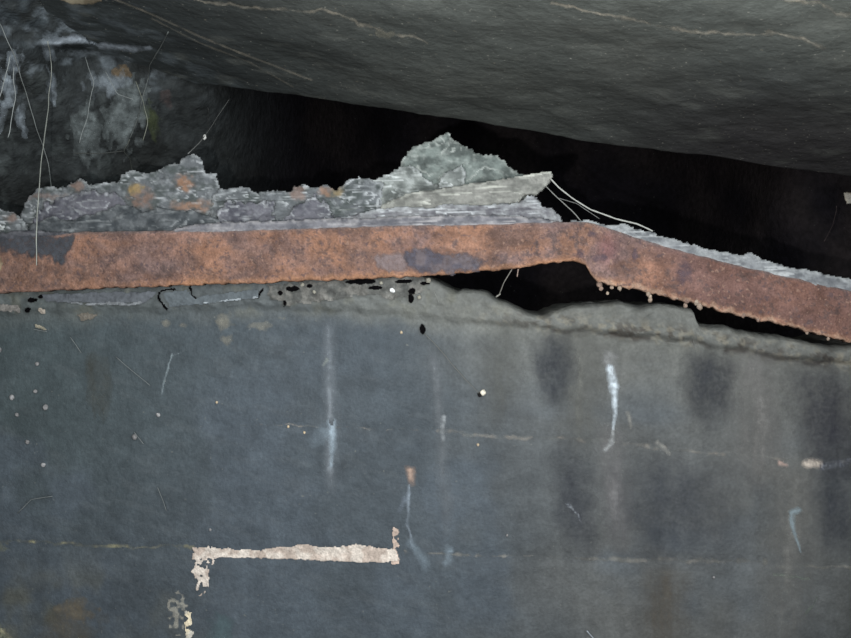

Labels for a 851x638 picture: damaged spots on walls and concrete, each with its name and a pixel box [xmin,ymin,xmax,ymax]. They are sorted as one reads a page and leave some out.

corrosion [0,132,851,291]
water stain [605,360,618,450]
peeling [191,527,400,596]
water stain [785,505,800,584]
peeling [168,600,194,638]